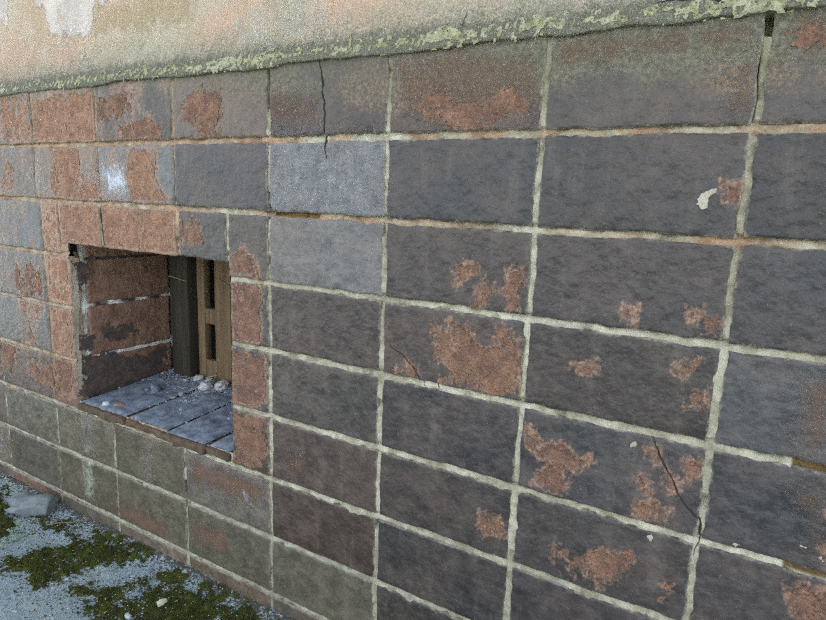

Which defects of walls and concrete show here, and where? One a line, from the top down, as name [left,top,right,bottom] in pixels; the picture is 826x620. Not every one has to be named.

peeling [35,0,105,39]
crack [319,61,328,159]
spalling [416,84,529,131]
spalling [428,322,521,396]
crack [653,437,702,555]
spalling [548,542,635,589]
spalling [787,584,826,620]